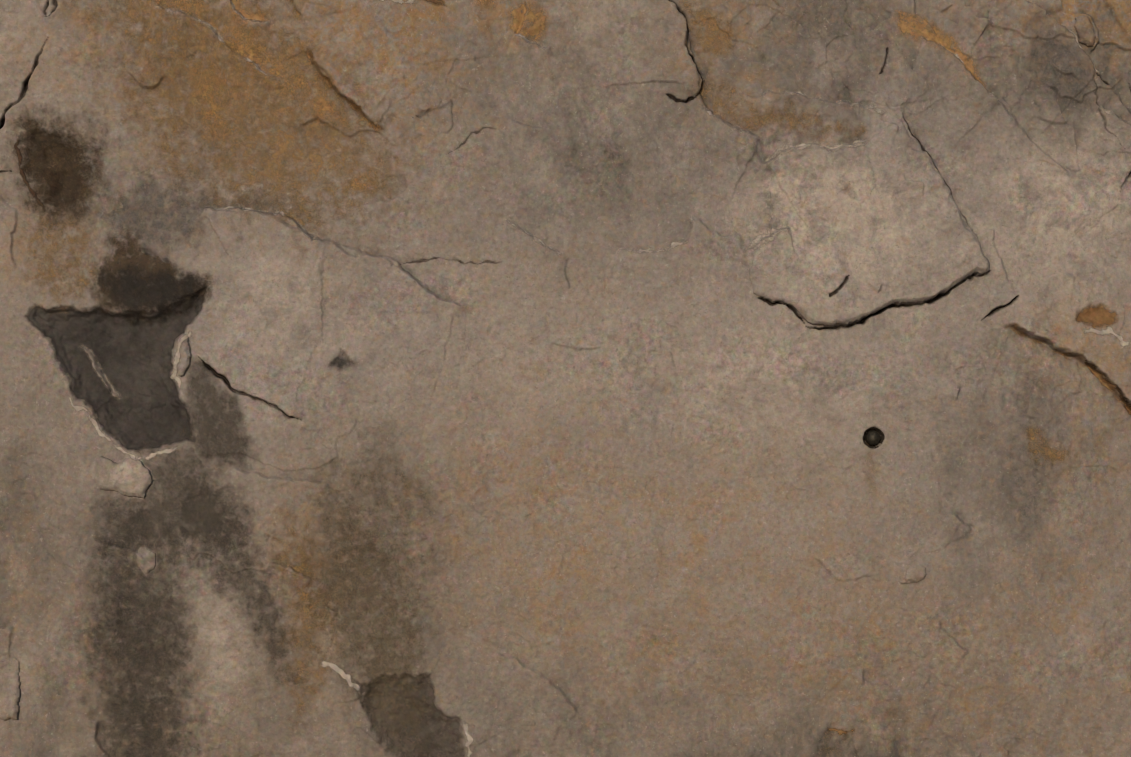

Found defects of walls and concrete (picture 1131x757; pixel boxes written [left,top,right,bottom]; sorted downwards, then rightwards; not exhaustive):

crack [0,50,43,129]
crack [666,54,703,103]
corrosion [898,12,979,81]
water stain [14,117,102,226]
crack [829,275,849,297]
crack [759,288,951,330]
spalling [27,296,204,498]
crack [203,361,301,420]
crack [1085,360,1131,407]
water stain [93,362,285,757]
spalling [322,661,473,757]